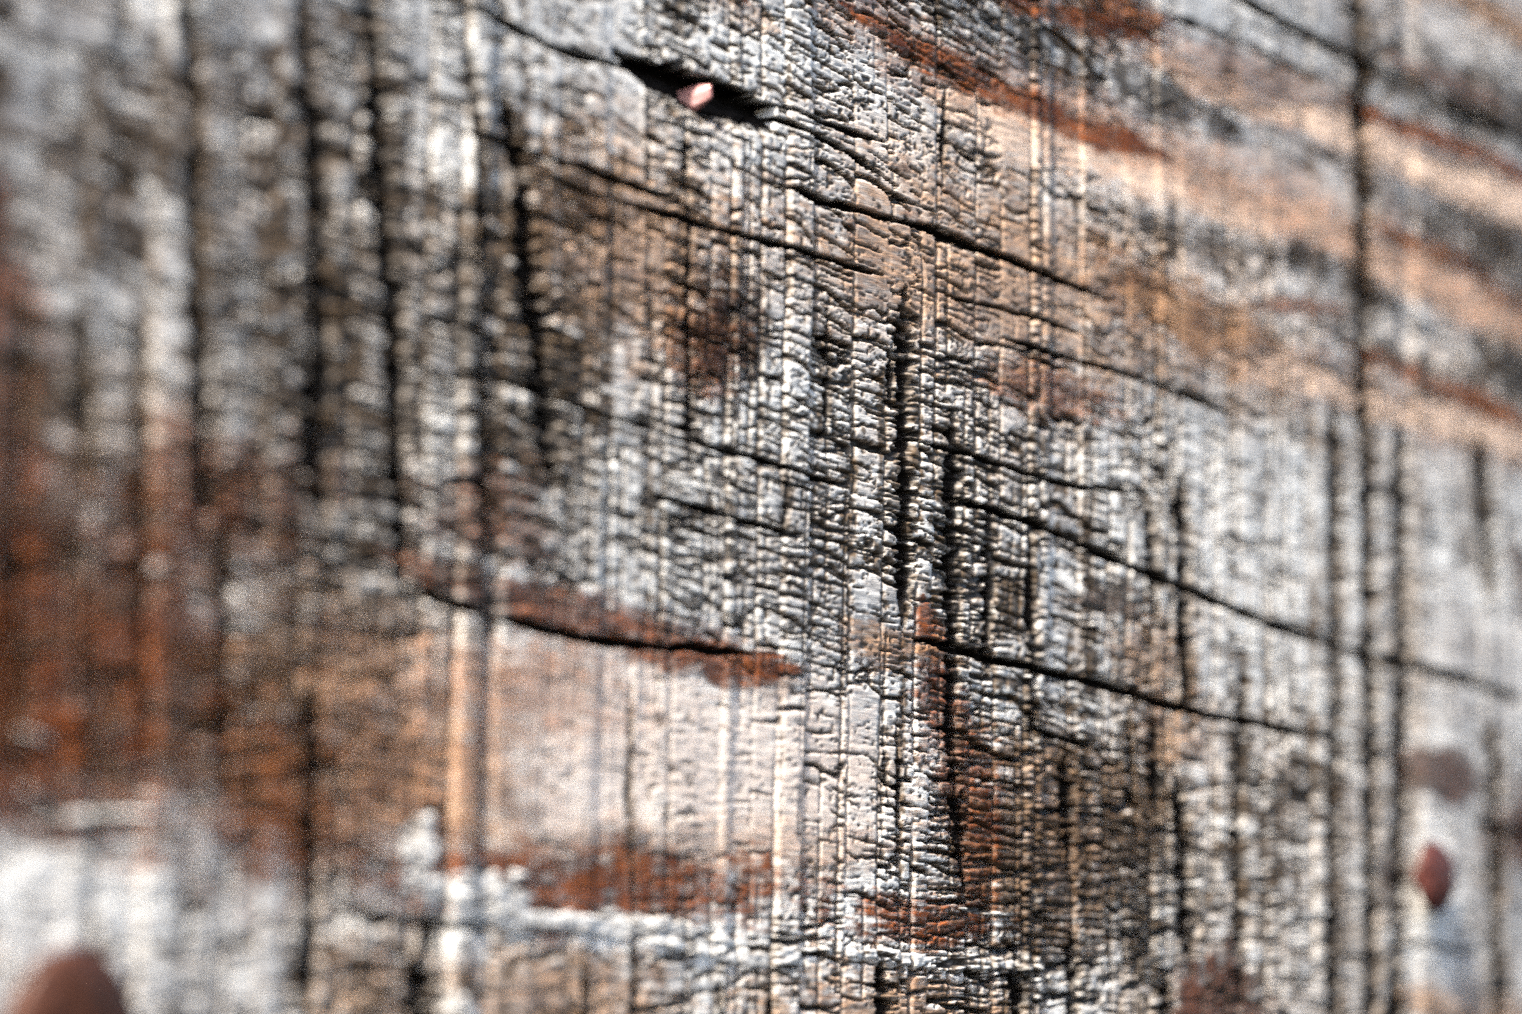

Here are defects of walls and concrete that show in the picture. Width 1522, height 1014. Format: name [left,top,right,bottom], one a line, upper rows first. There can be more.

crack [760,104,1103,300]
crack [175,0,878,795]
crack [69,303,154,812]
crack [884,0,1522,1014]
crack [291,682,490,1014]
crack [624,709,634,898]
crack [880,743,900,859]
crack [580,956,589,1014]
crack [628,940,636,1007]
crack [712,983,721,1014]
crack [762,988,773,1014]
crack [871,963,890,1014]